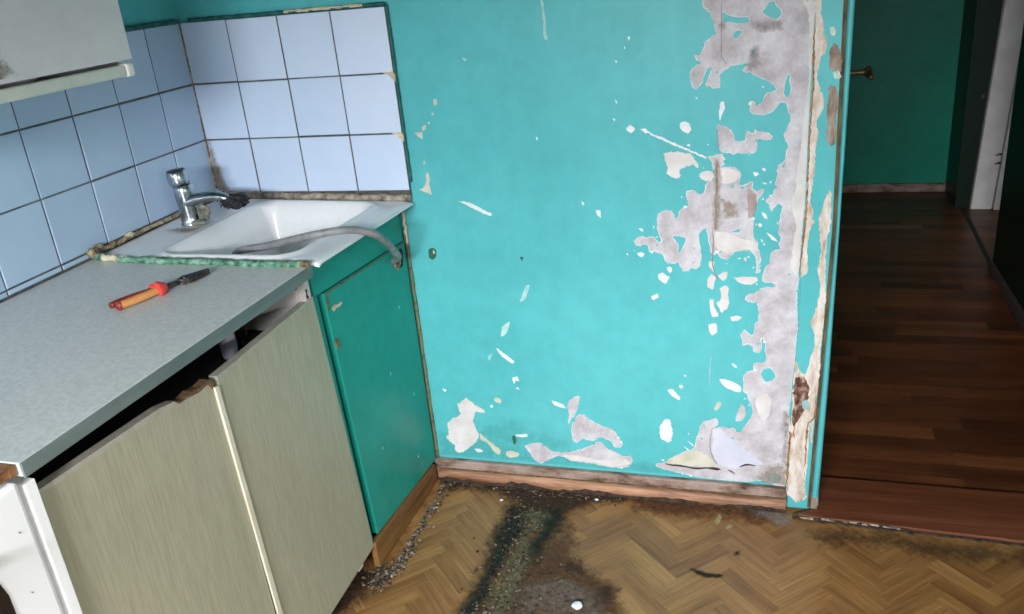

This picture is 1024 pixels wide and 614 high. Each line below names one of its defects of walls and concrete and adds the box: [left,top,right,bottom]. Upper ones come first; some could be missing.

peeling [392,99,437,142]
peeling [420,161,432,195]
peeling [627,0,842,486]
peeling [446,396,633,469]
rust [761,396,816,492]
leakage [527,505,568,567]